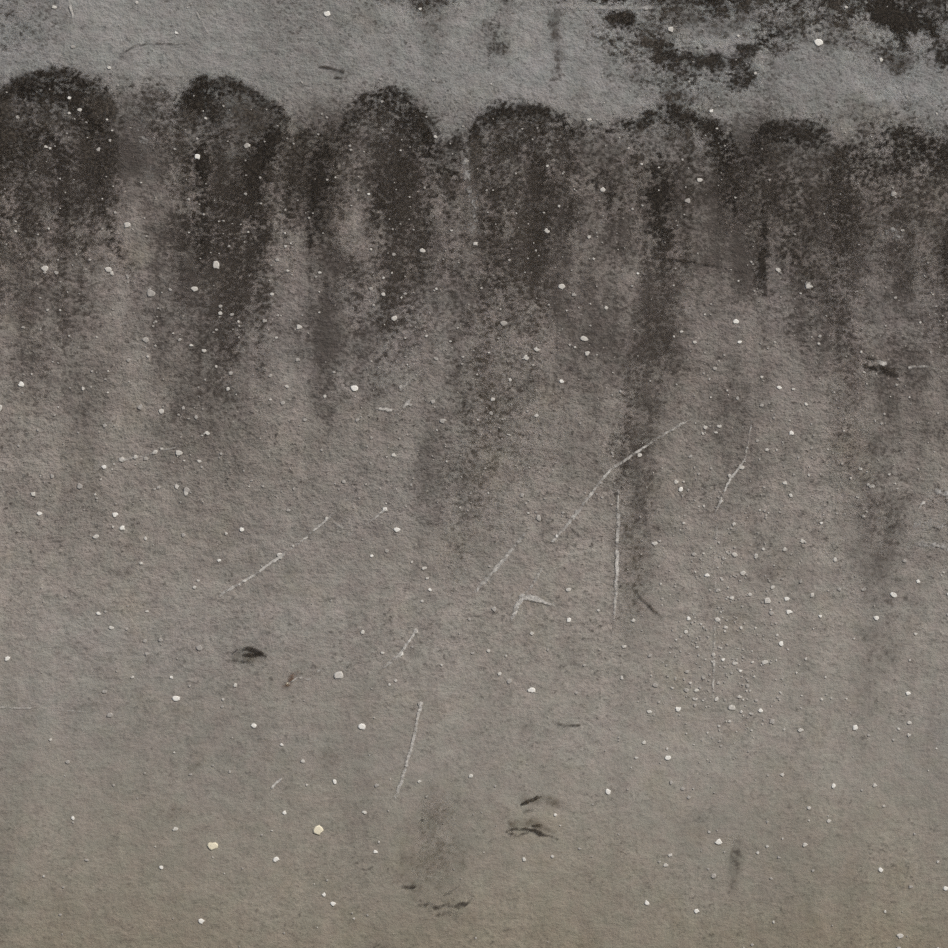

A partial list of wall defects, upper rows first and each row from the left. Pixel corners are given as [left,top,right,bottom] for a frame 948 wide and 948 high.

water stain [0,67,131,275]
water stain [129,75,594,353]
water stain [579,0,948,527]